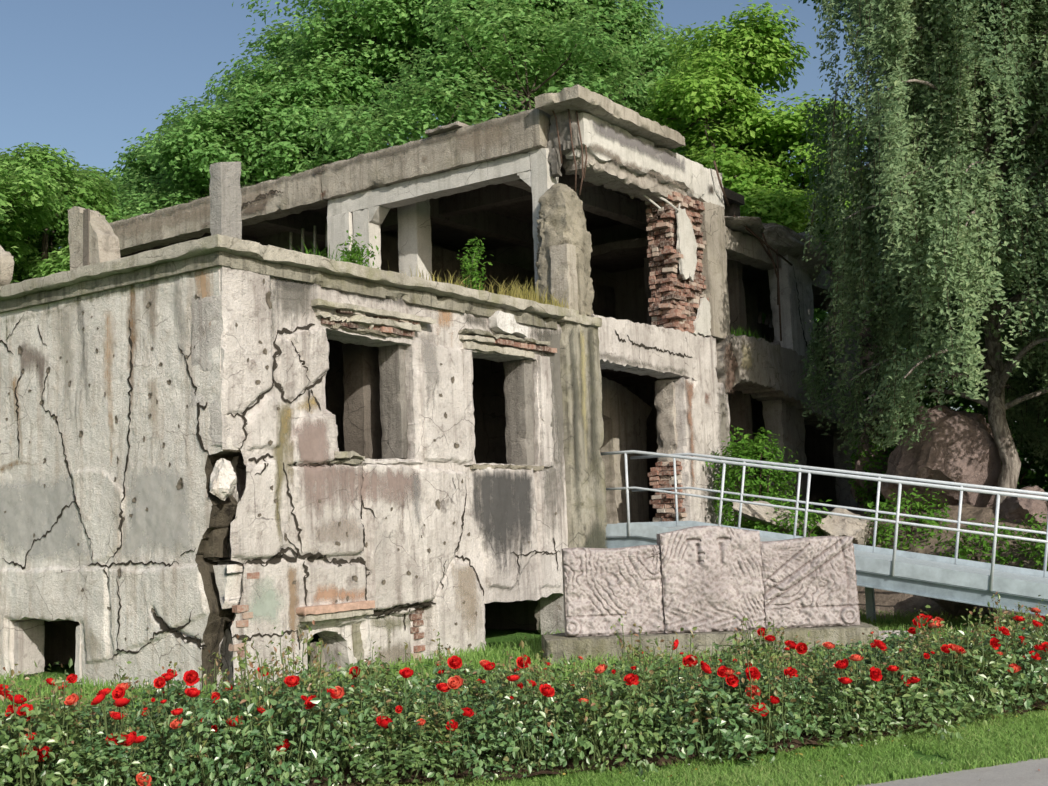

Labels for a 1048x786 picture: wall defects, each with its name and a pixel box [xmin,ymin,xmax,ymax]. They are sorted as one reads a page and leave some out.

flaking render [675,208,697,282]
crack [615,330,692,358]
flaking render [693,297,711,337]
crack [0,316,484,660]